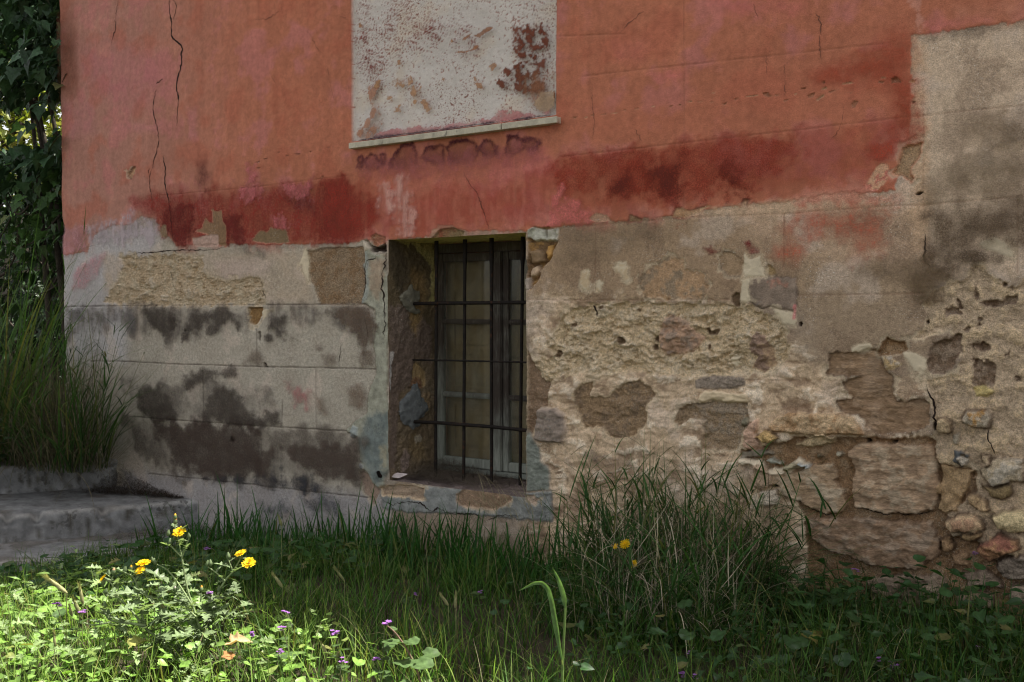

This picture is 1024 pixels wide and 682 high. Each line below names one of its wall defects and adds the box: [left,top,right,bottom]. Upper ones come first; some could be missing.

water stain [67,305,250,342]
crack [133,0,225,288]
spalling [104,209,273,325]
water stain [63,121,541,254]
water stain [332,306,377,366]
peeling [357,76,549,139]
peeling [489,21,551,94]
spalling [525,227,560,291]
spalling [535,251,796,403]
water stain [902,155,1024,303]
water stain [121,364,367,514]
spalling [738,265,1024,611]